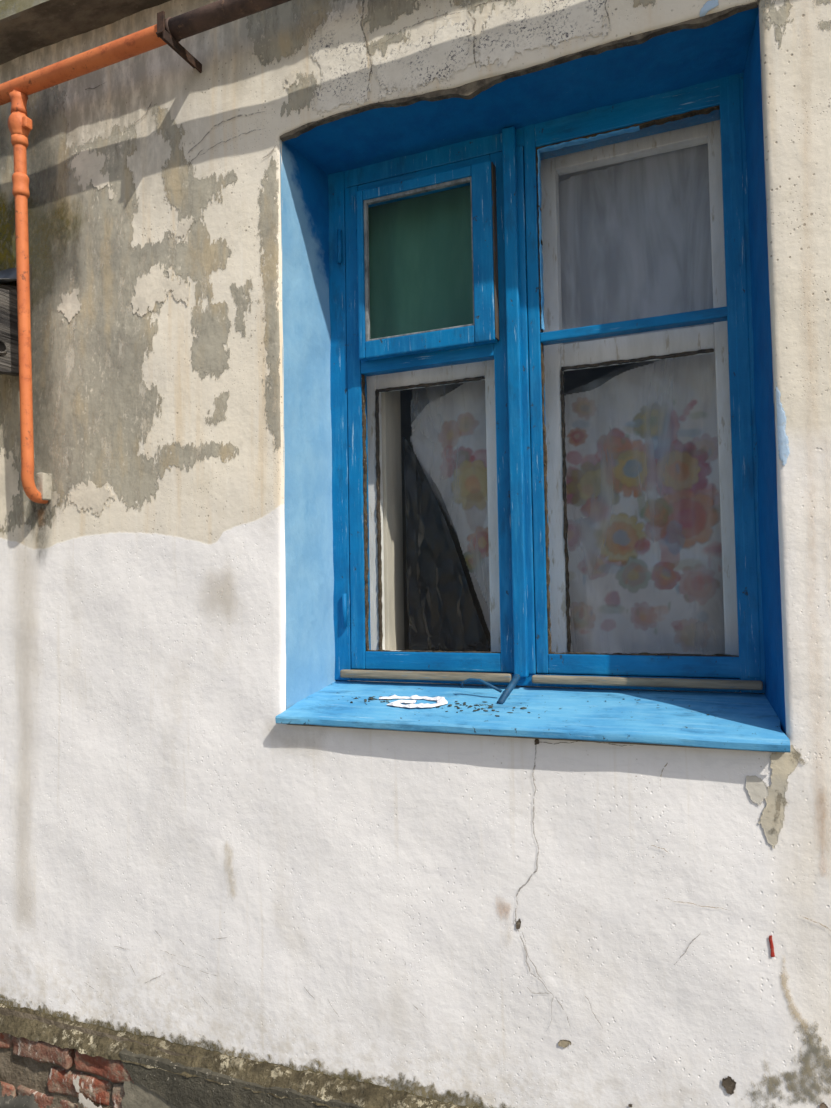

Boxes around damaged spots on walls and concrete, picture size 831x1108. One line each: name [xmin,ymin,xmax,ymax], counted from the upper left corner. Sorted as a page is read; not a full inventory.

peeling [246,0,794,142]
peeling [0,86,281,534]
peeling [746,745,805,849]
crack [515,741,633,1025]
damp [781,975,807,1028]